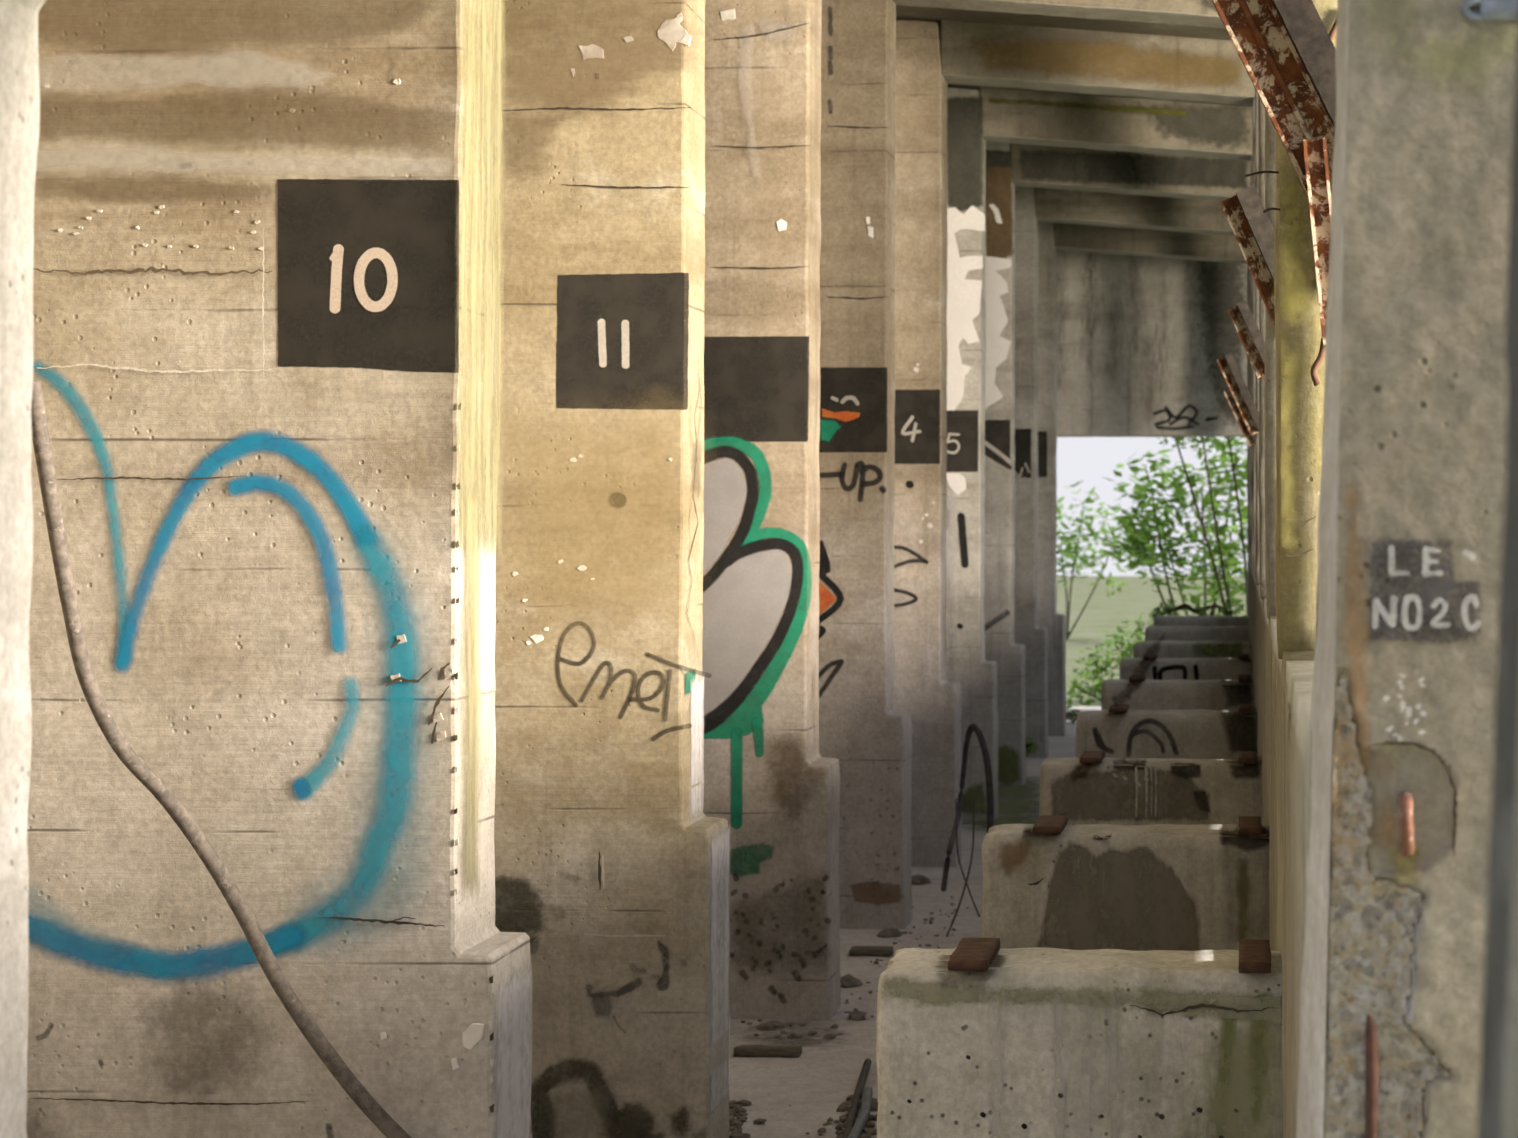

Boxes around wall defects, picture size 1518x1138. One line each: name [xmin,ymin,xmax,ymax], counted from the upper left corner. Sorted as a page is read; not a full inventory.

water stain [38,0,416,48]
crack [37,229,271,375]
water stain [1112,636,1164,707]
water stain [1051,759,1210,821]
water stain [1221,606,1285,939]
water stain [1038,845,1199,951]
spalling [1325,671,1450,1138]
water stain [1209,994,1278,1138]
rust [1365,1014,1378,1138]